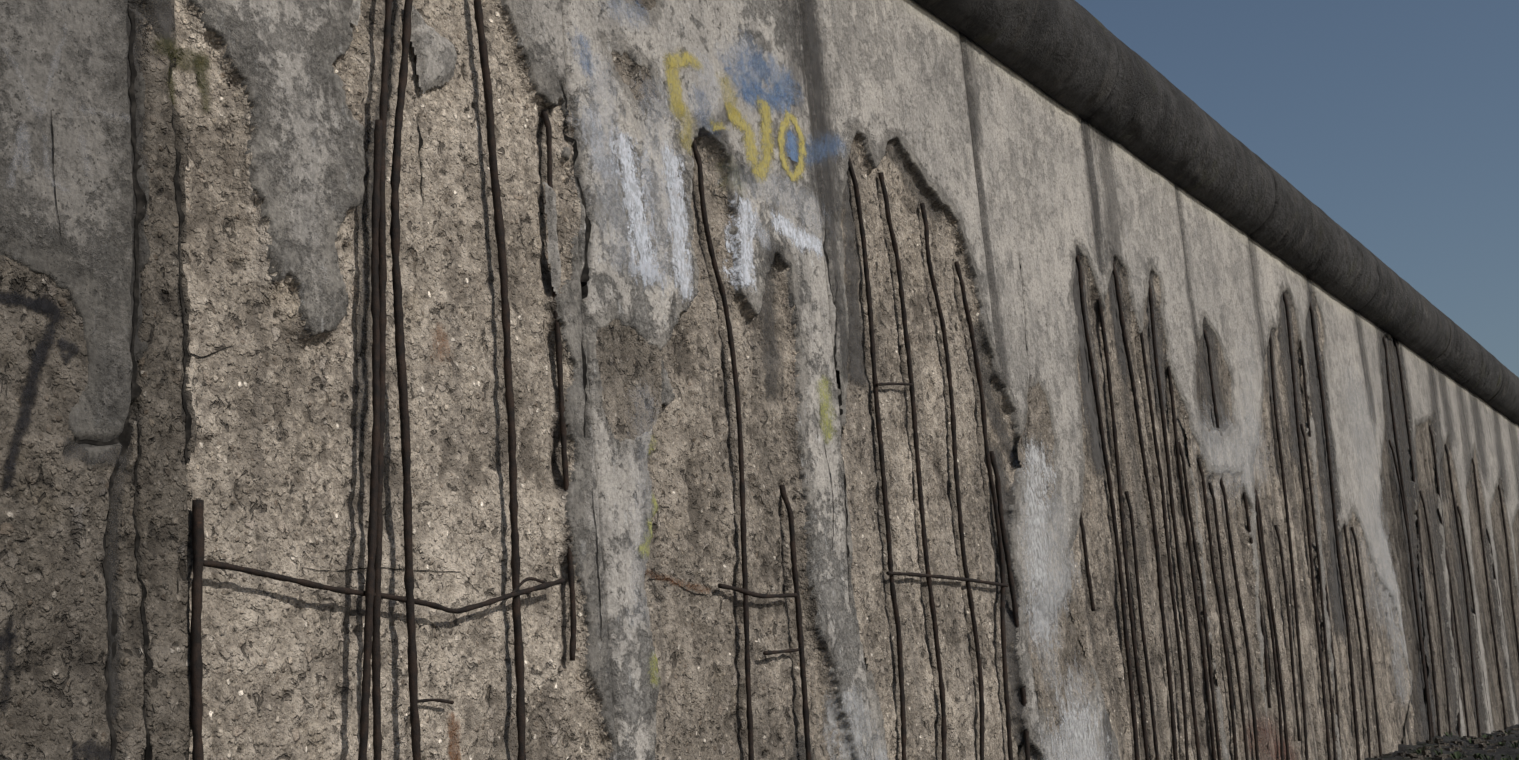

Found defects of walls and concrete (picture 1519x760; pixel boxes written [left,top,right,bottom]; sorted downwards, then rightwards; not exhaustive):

crack [51,112,61,236]
crack [64,0,234,760]
spalling [0,0,615,760]
spalling [596,127,855,760]
damp [761,245,781,399]
damp [827,687,886,760]
damp [959,33,1116,760]
spalling [840,134,1519,760]